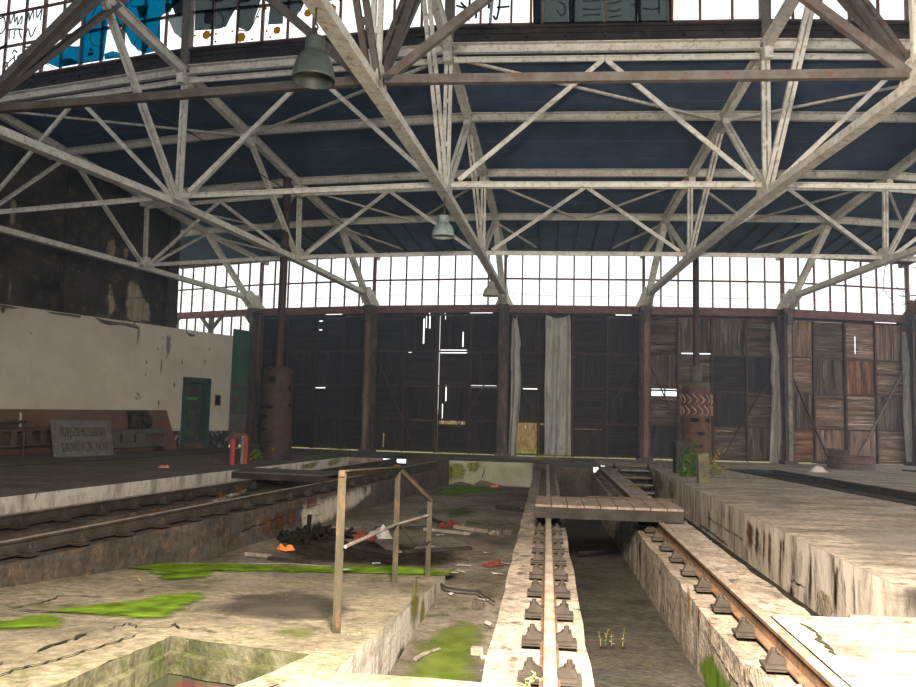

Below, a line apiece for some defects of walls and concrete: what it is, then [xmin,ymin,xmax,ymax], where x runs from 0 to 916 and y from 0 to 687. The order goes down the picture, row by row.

water stain [799,552,812,601]
crack [0,595,139,675]